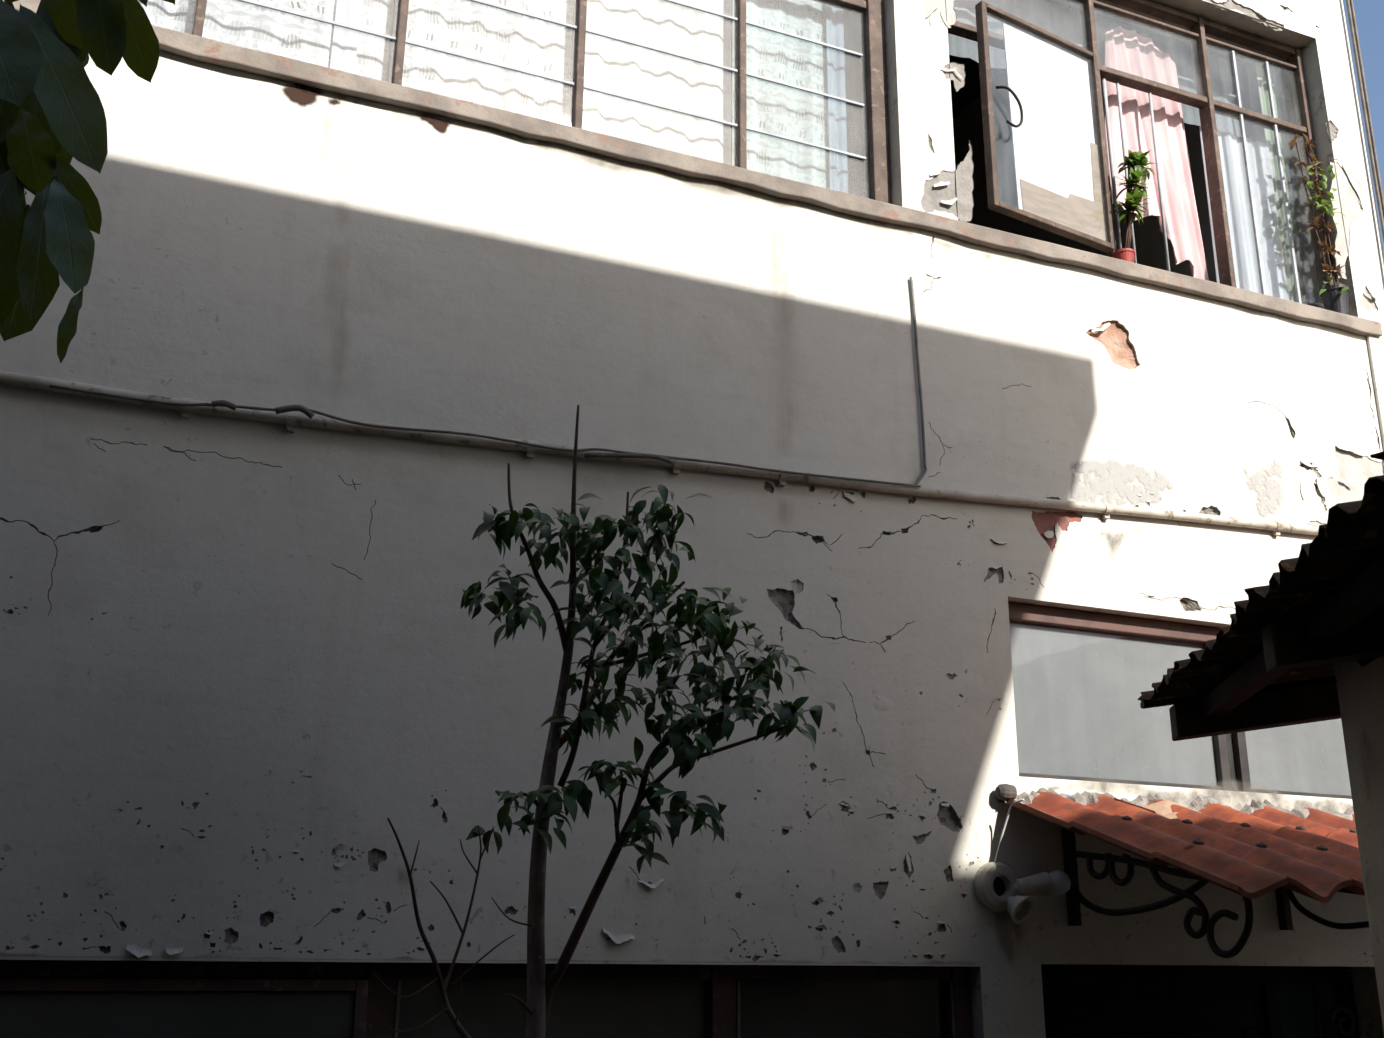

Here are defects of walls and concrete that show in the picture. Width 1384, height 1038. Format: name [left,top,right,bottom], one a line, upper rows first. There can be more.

peeling [921,140,974,222]
peeling [1324,120,1367,279]
spalling [1085,320,1140,369]
crack [1248,401,1296,439]
crack [0,517,119,617]
crack [802,594,915,653]
crack [747,514,1007,551]
peeling [1031,460,1174,552]
crack [1144,596,1235,611]
peeling [1244,446,1384,527]
crack [843,682,886,767]
spalling [770,755,979,959]